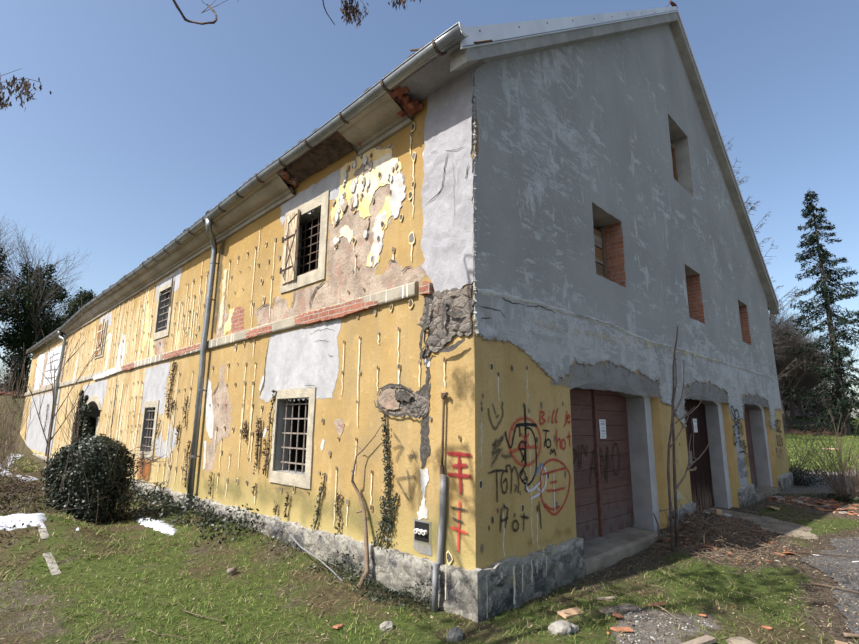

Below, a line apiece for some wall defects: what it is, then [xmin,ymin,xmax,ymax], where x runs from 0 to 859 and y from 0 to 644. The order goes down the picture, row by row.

crack [430,145,469,201]
damp [62,290,195,402]
damp [214,242,227,331]
peeling [178,122,476,504]
damp [105,386,140,455]
damp [156,372,179,486]
peeling [155,423,185,481]